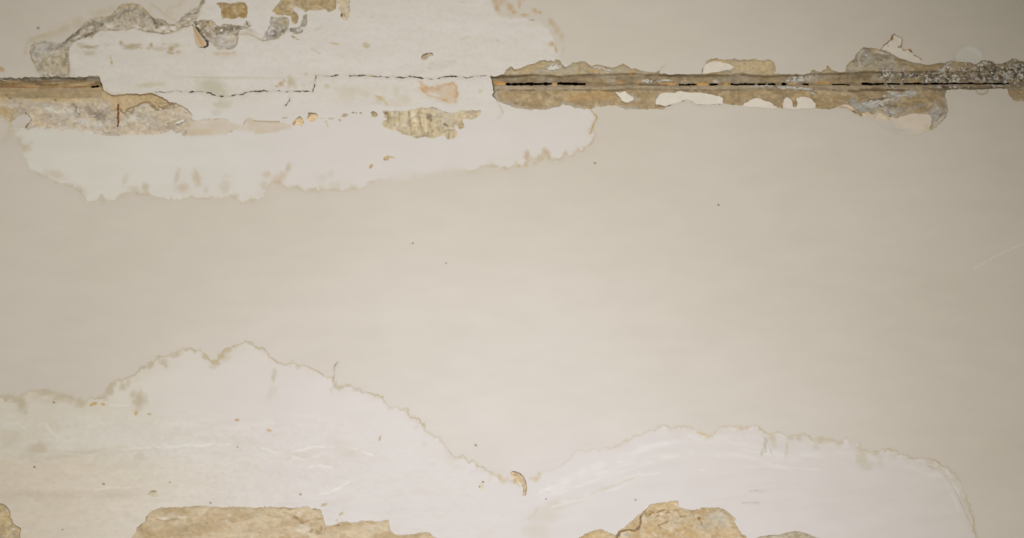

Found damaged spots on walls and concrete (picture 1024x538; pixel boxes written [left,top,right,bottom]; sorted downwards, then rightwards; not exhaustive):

flaking render [0,0,481,139]
crack [152,72,494,108]
flaking render [490,32,1024,130]
flaking render [510,471,527,497]
flaking render [0,503,21,538]
flaking render [132,490,436,538]
flaking render [579,500,816,538]